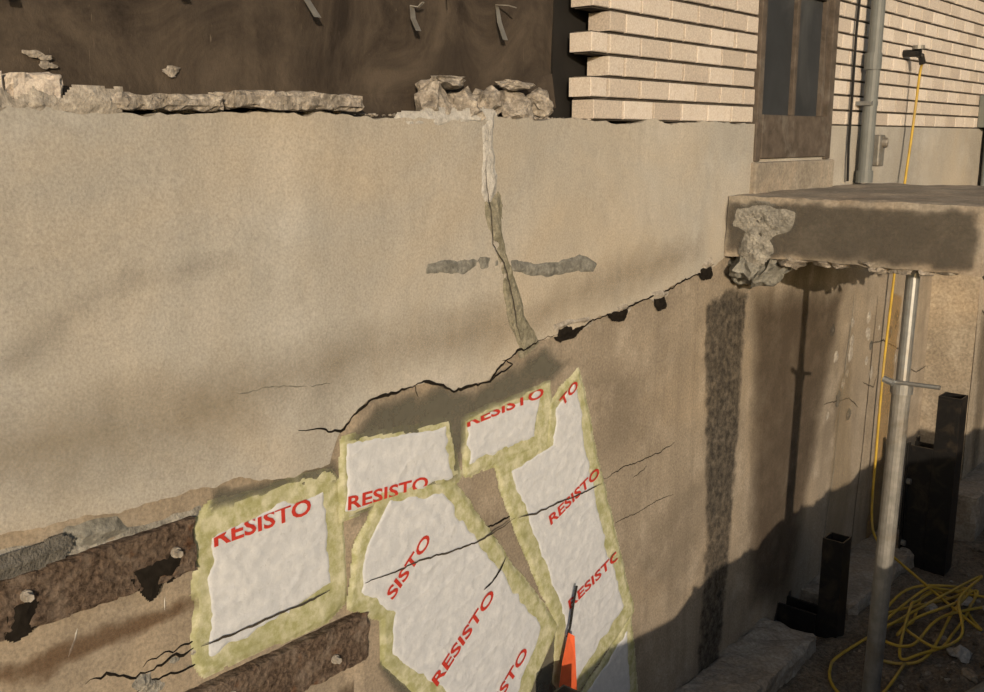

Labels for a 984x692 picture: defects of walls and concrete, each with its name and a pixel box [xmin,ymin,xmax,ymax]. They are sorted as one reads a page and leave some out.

spalling [2,50,63,99]
peeling [162,65,180,78]
spalling [112,90,364,113]
spalling [414,75,554,121]
spalling [728,201,958,288]
crack [298,109,714,433]
crack [604,446,670,479]
spalling [0,505,201,580]